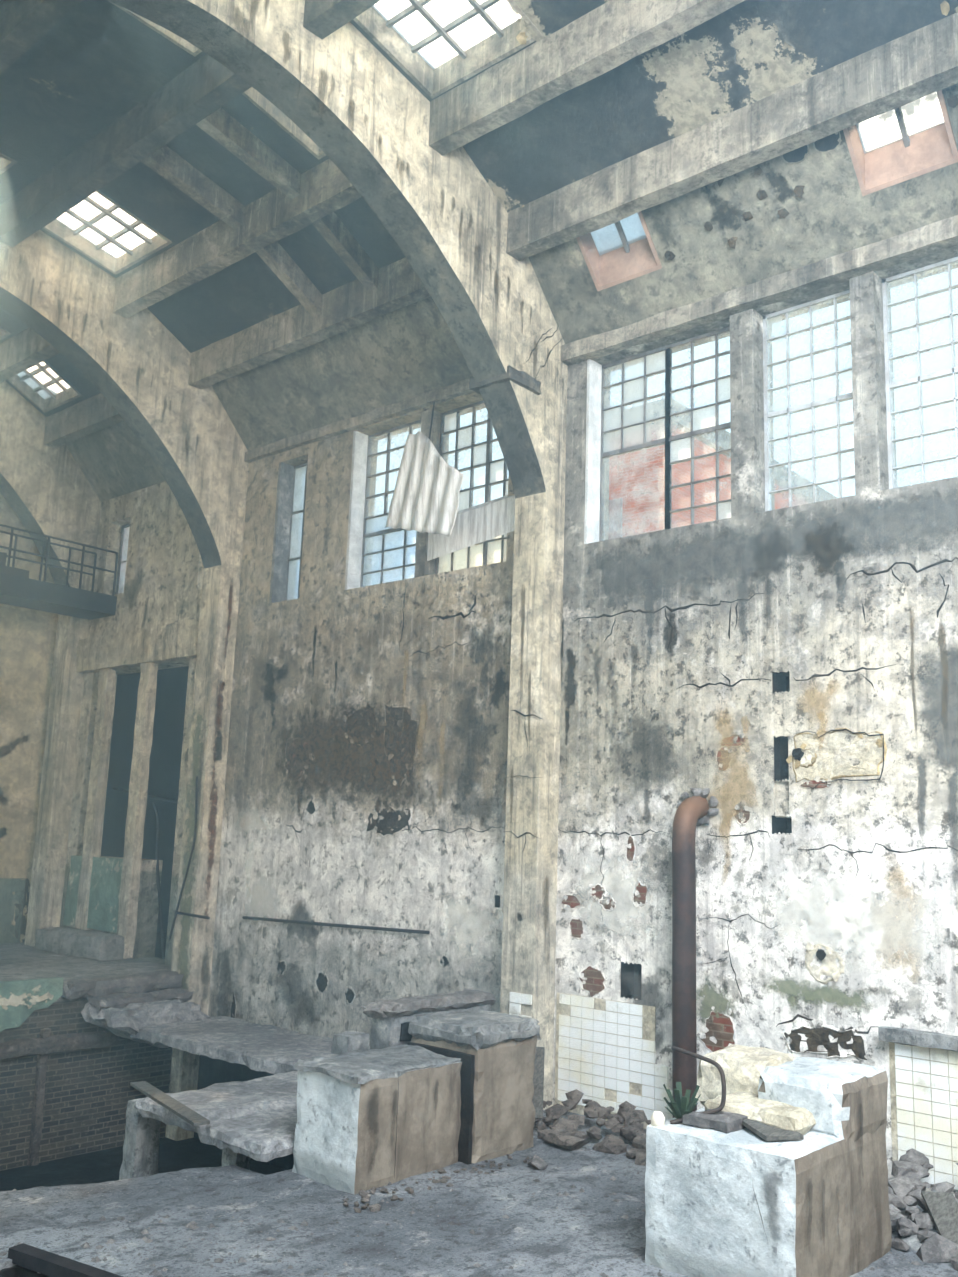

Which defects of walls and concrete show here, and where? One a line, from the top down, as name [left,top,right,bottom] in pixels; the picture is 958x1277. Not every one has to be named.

peeling [640,17,823,138]
water stain [601,490,958,662]
crack [845,557,958,623]
crack [571,593,764,643]
crack [677,664,896,689]
water stain [261,660,425,826]
spalling [774,735,833,790]
crack [707,830,770,860]
crack [797,843,952,878]
peeling [0,992,54,1010]
spalling [578,962,606,998]
spalling [621,961,642,1000]